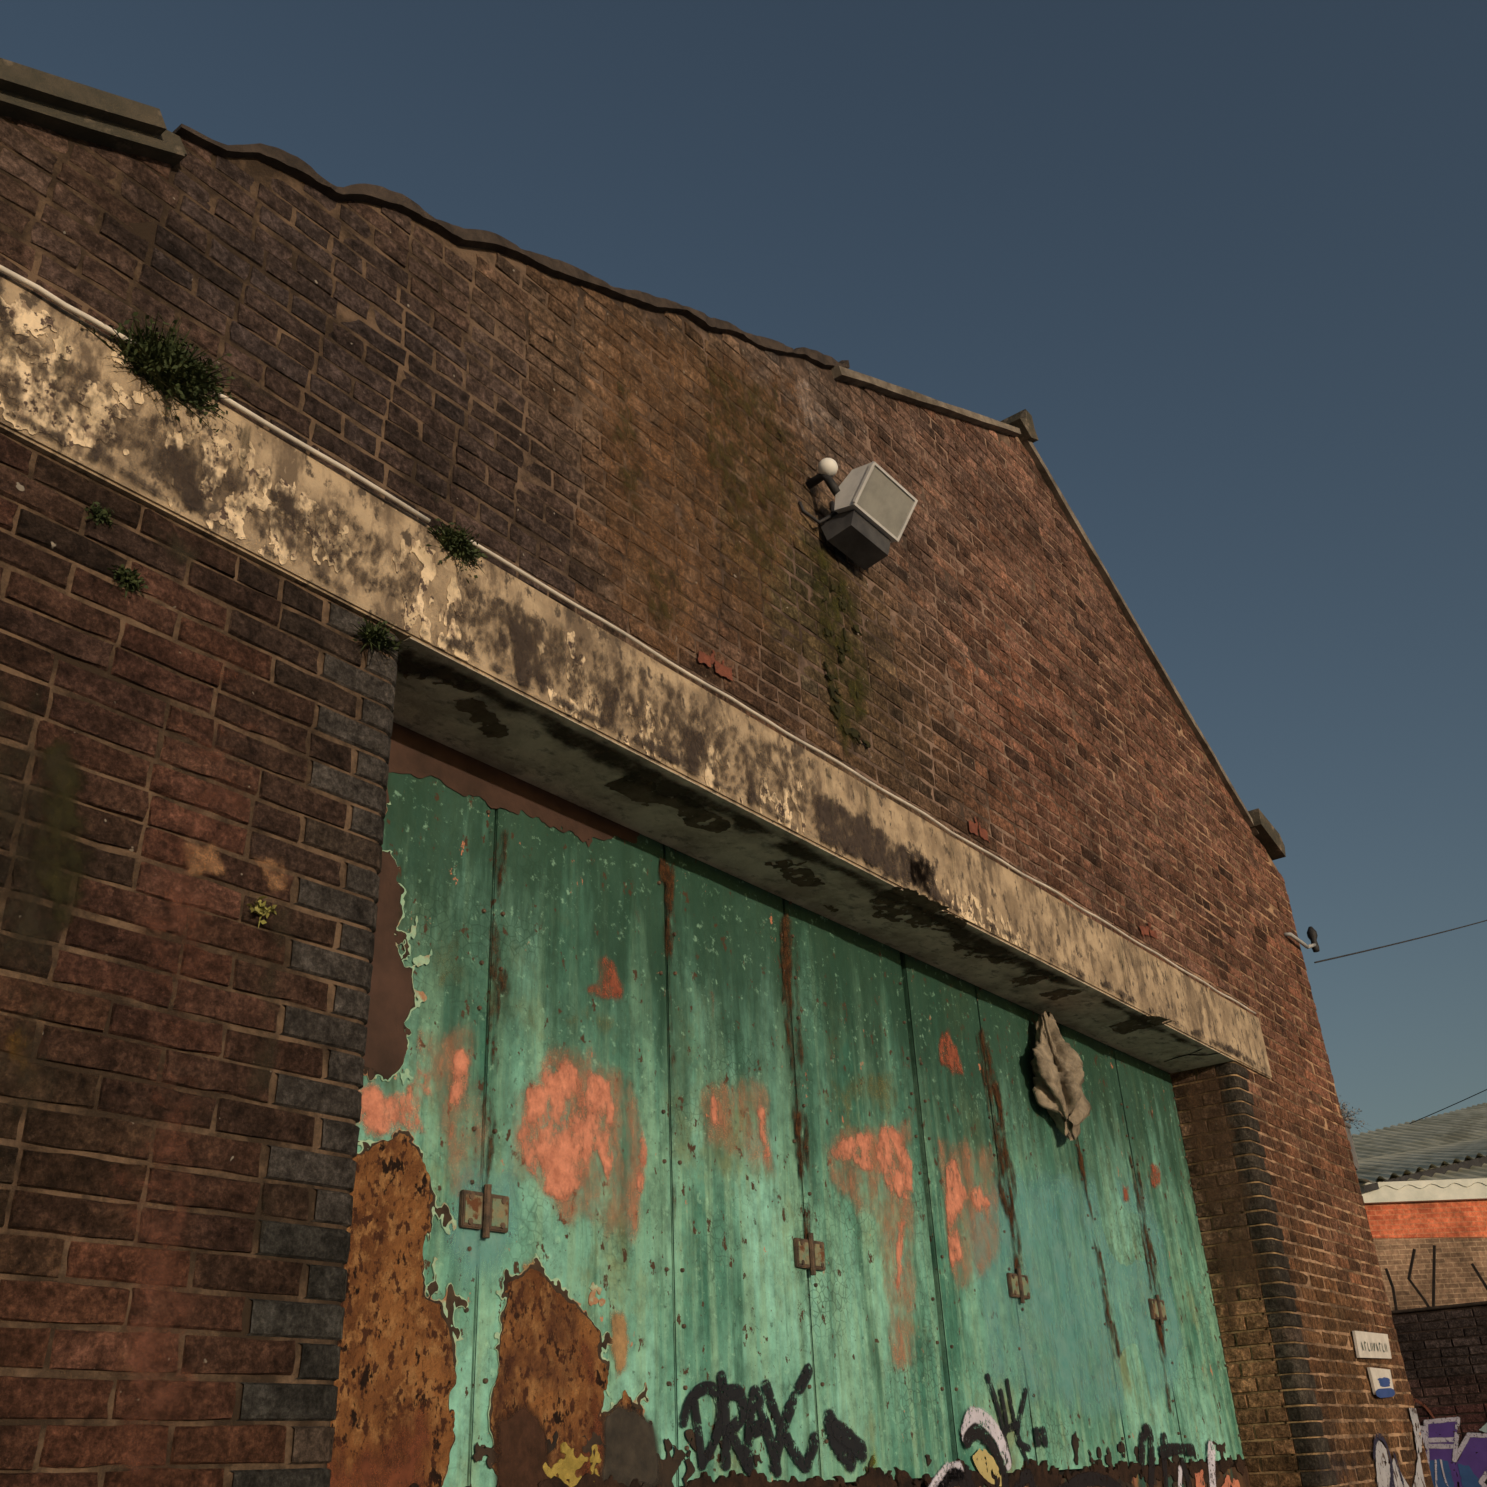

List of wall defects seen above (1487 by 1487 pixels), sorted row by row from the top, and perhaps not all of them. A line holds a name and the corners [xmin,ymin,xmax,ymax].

damp [0,297,420,604]
peeling [385,722,640,847]
damp [397,580,1085,987]
peeling [360,850,469,1156]
peeling [588,958,623,998]
damp [1102,949,1265,1070]
rust [327,1128,469,1487]
rust [487,1253,653,1487]
peeling [518,1057,647,1231]
peeling [829,1127,913,1305]
rust [976,1028,1022,1272]
rust [1154,1472,1220,1487]